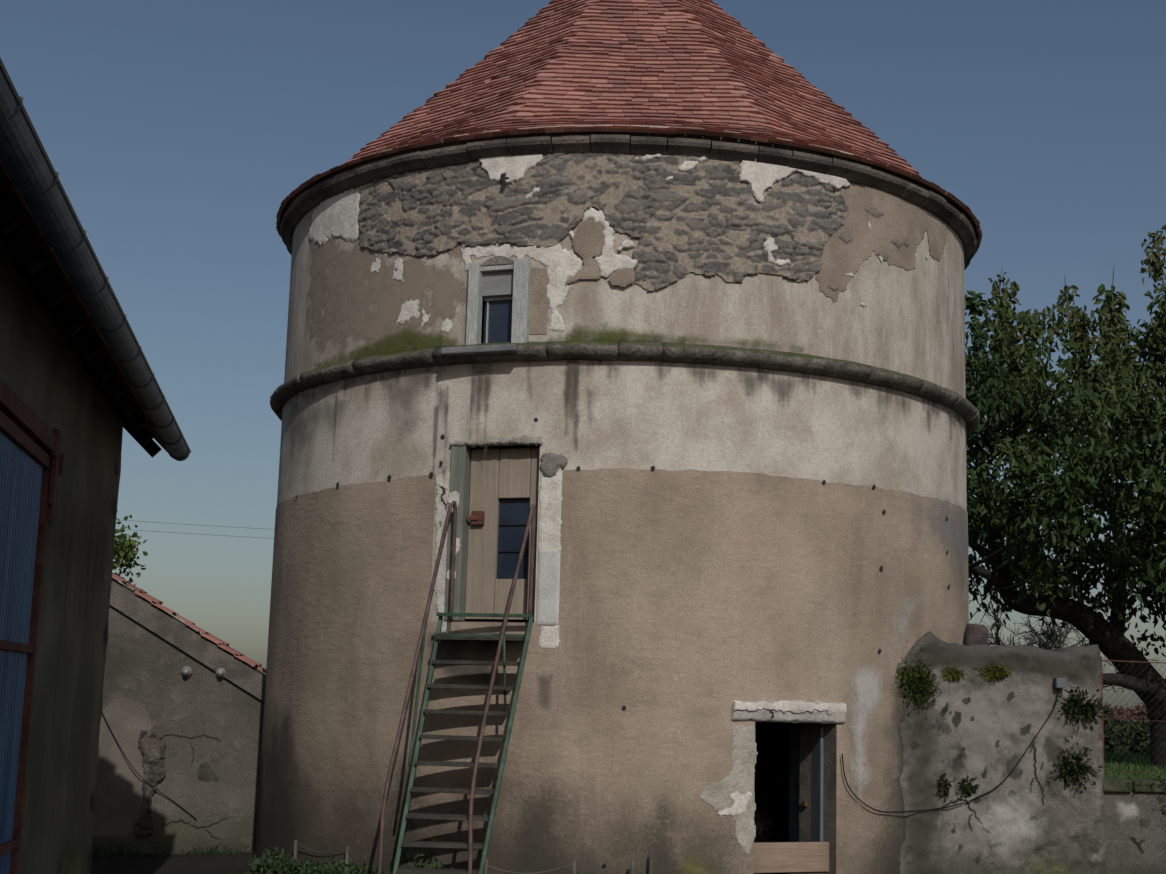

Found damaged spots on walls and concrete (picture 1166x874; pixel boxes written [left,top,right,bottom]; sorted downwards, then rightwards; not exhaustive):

spalling [307,149,947,349]
damp [434,392,447,456]
damp [566,362,578,422]
crack [163,733,222,764]
spalling [700,723,758,853]
crack [161,818,229,838]